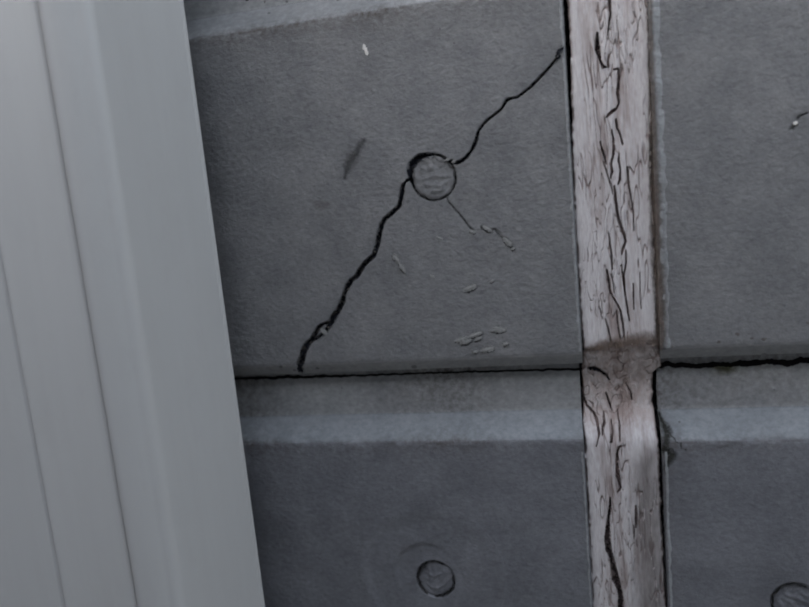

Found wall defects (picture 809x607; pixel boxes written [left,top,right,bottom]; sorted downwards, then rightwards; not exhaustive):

crack [294,46,564,372]
crack [594,0,643,341]
crack [581,367,637,607]